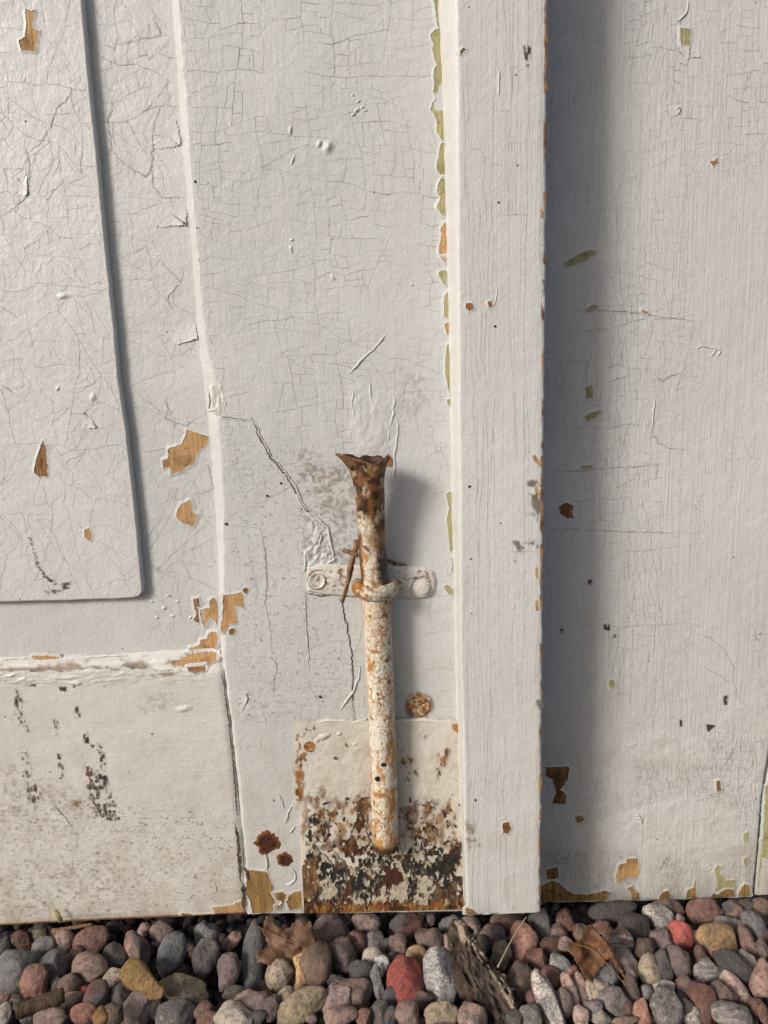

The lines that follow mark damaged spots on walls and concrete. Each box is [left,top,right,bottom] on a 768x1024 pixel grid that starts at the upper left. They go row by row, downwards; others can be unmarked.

peeling [16,7,42,55]
peeling [428,0,451,409]
peeling [32,438,51,480]
peeling [160,427,210,478]
crack [0,0,447,916]
peeling [168,586,251,676]
corrosion [253,727,473,914]
peeling [543,764,587,825]
peeling [178,867,303,915]
peeling [540,856,641,902]